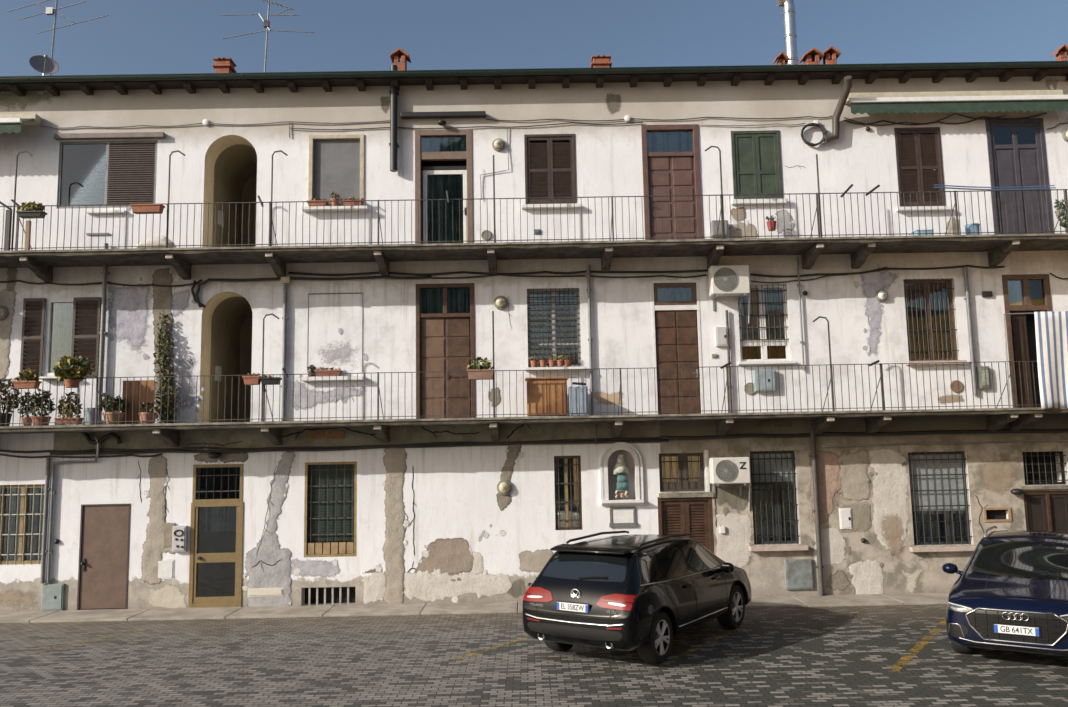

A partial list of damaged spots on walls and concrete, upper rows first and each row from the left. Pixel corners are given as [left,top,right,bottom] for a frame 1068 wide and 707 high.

flaking render [0,289,17,381]
peeling [108,268,205,418]
peeling [854,265,898,356]
flaking render [140,456,175,585]
flaking render [242,451,340,607]
flaking render [361,444,553,604]
flaking render [806,448,910,594]